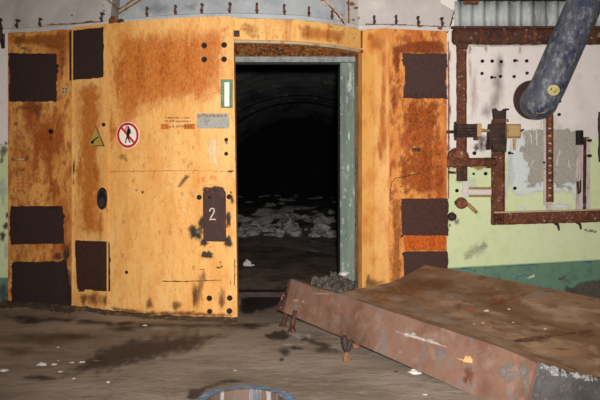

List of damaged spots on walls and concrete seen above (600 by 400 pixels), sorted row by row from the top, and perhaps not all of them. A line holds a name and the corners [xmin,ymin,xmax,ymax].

corrosion [14,34,64,72]
corrosion [77,85,102,234]
corrosion [114,35,220,131]
corrosion [393,41,451,198]
peeling [505,129,543,196]
spalling [553,128,578,208]
corrosion [391,200,446,281]
leakage [79,320,152,330]
leakage [72,335,213,370]
leakage [265,329,341,361]